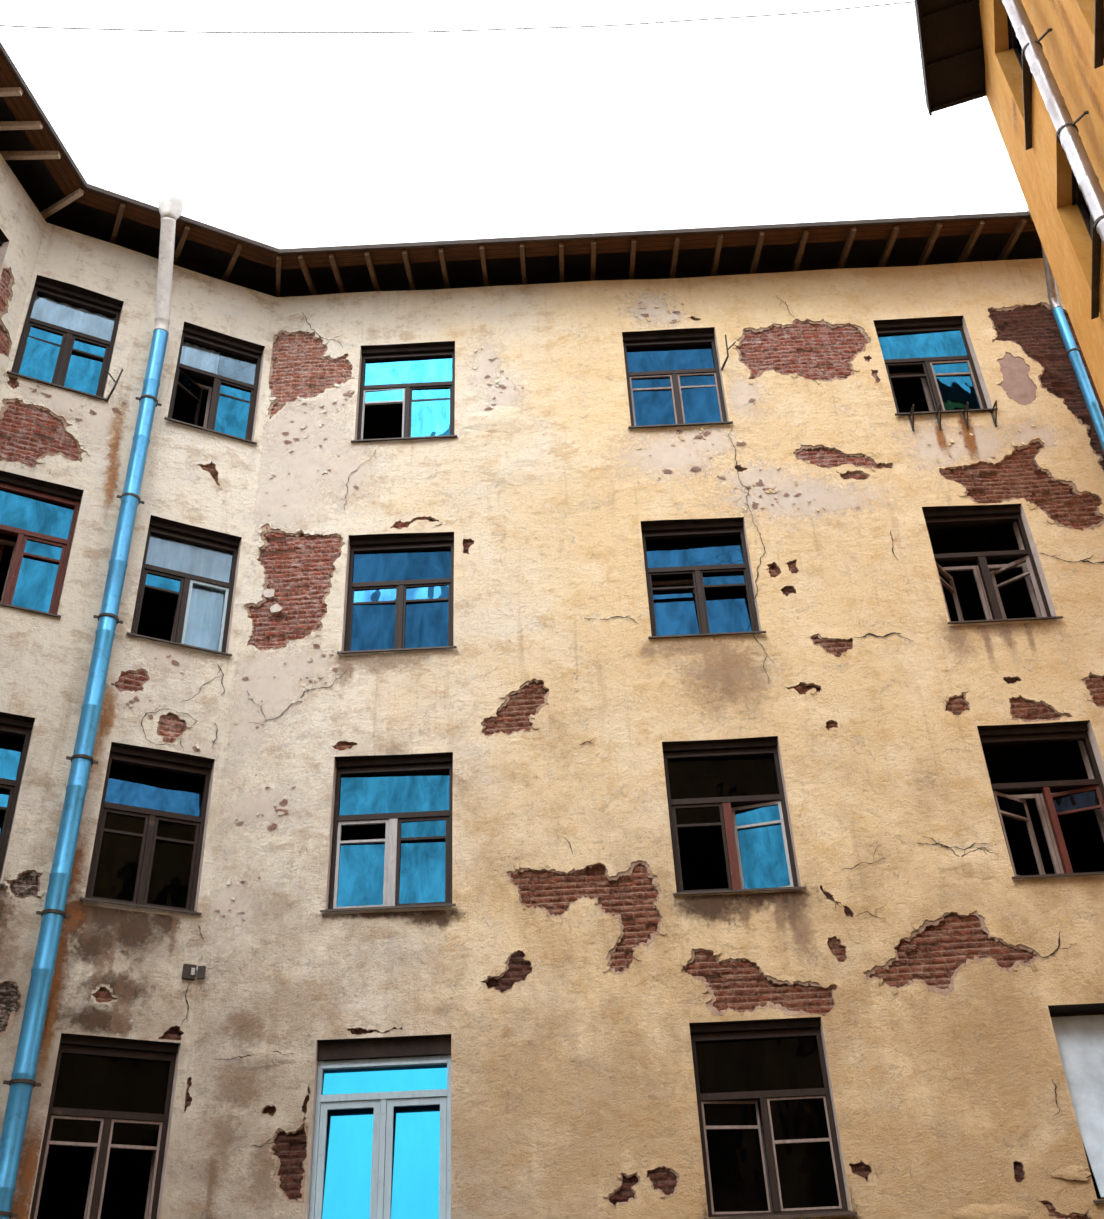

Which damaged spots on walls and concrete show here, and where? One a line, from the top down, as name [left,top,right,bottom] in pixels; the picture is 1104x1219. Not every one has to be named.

spalling [0,375,127,468]
spalling [730,317,881,415]
spalling [988,302,1104,471]
spalling [628,424,1104,530]
spalling [231,328,373,754]
crack [728,430,774,679]
crack [141,663,346,751]
crack [918,836,996,871]
leakage [63,899,179,1033]
spalling [506,860,667,974]
spalling [680,947,838,1016]
spalling [864,910,1042,996]